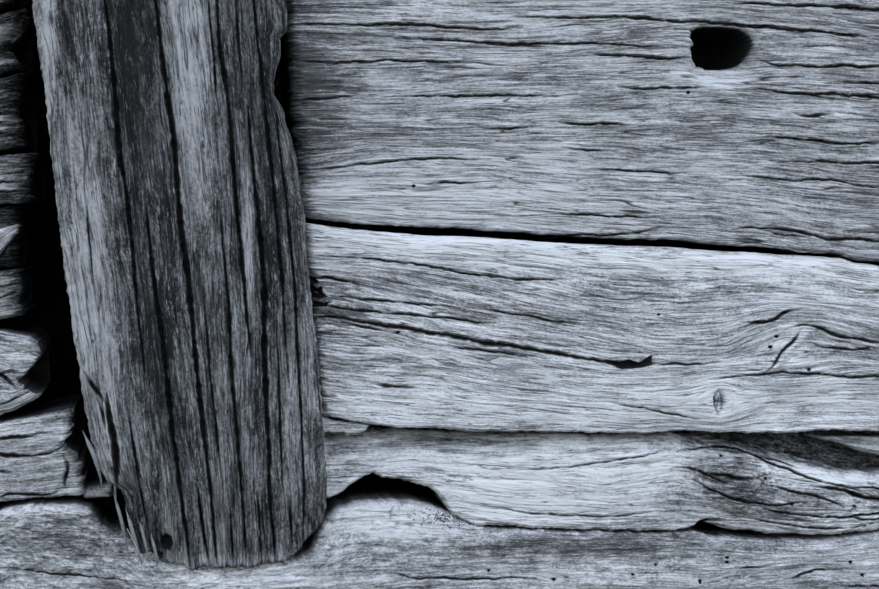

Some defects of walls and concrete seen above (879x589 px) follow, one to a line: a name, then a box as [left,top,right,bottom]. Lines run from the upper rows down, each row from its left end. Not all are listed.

crack [104,0,653,558]
crack [661,310,879,379]
crack [537,446,879,529]